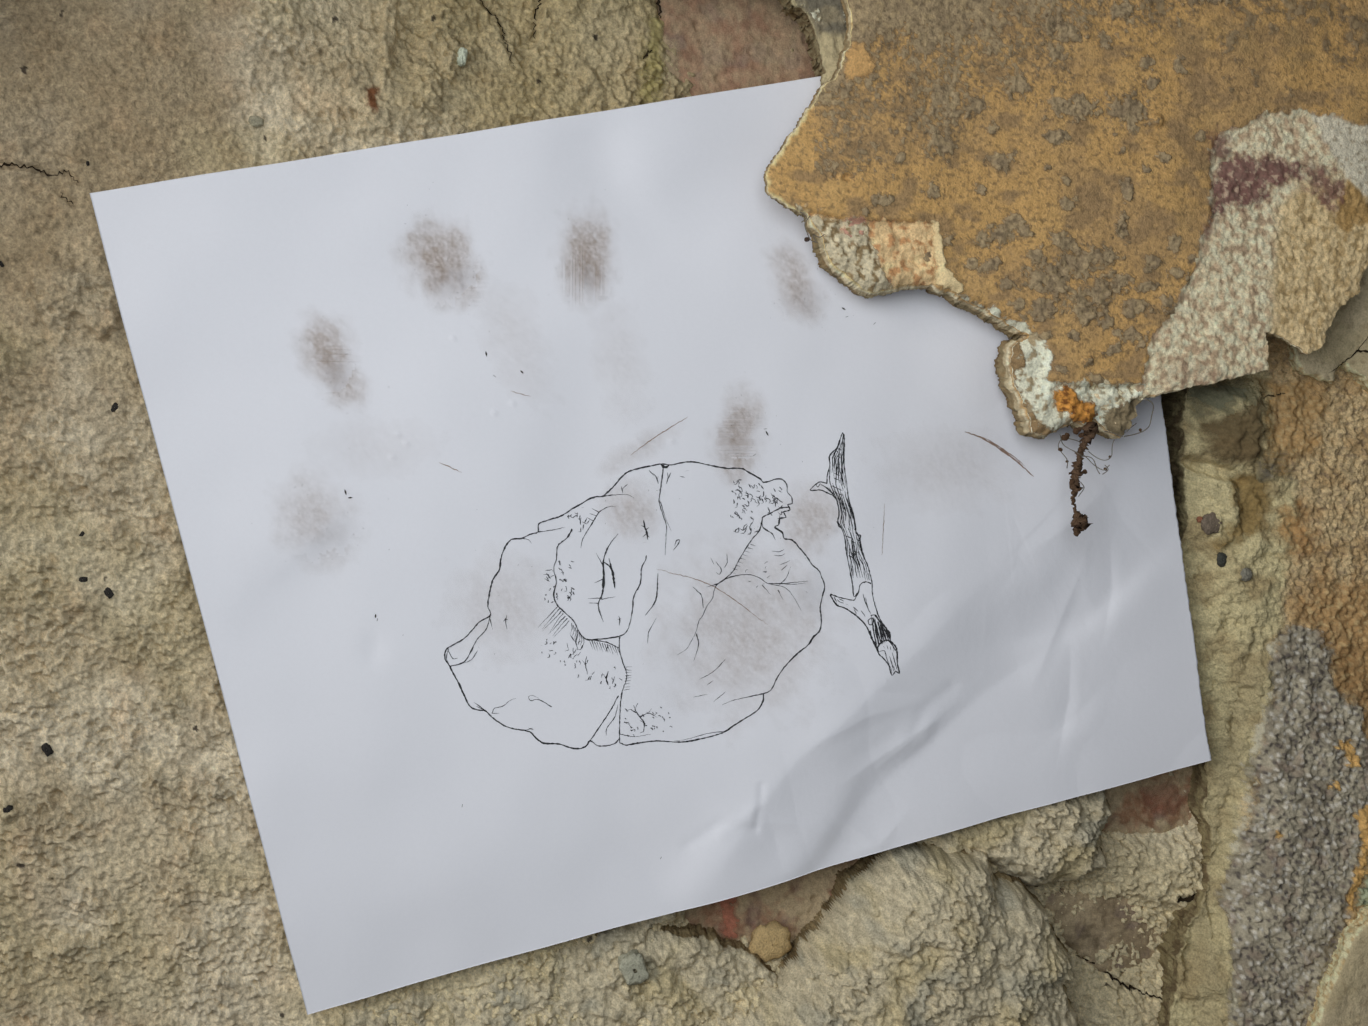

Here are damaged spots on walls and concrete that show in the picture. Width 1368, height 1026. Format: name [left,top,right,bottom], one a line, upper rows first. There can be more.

peeling [795,0,1368,437]
crack [1329,337,1368,373]
spalling [1216,625,1368,1026]